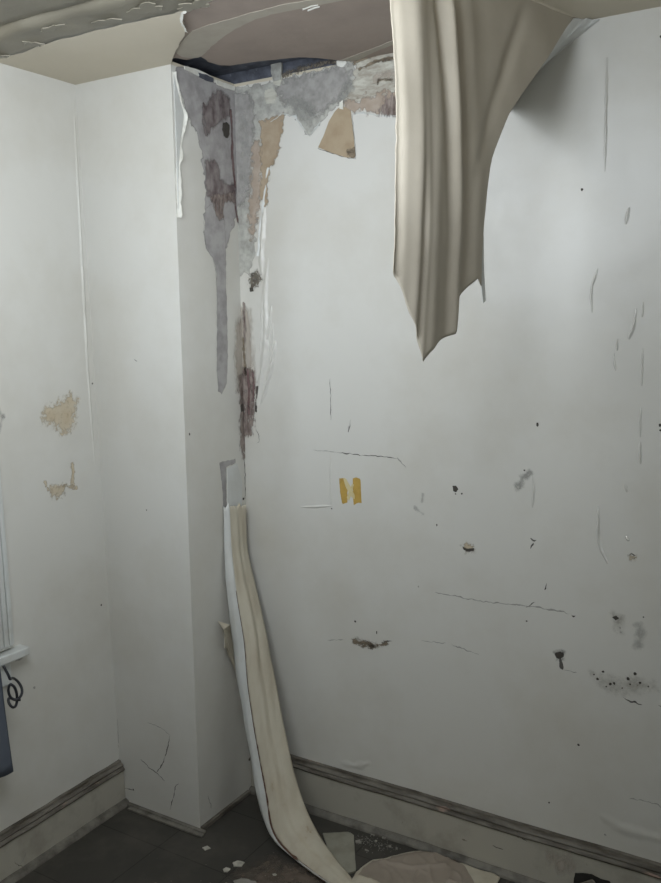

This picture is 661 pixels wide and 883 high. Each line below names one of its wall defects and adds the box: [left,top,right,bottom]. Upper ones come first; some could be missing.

peeling [172,0,600,394]
peeling [218,459,500,883]